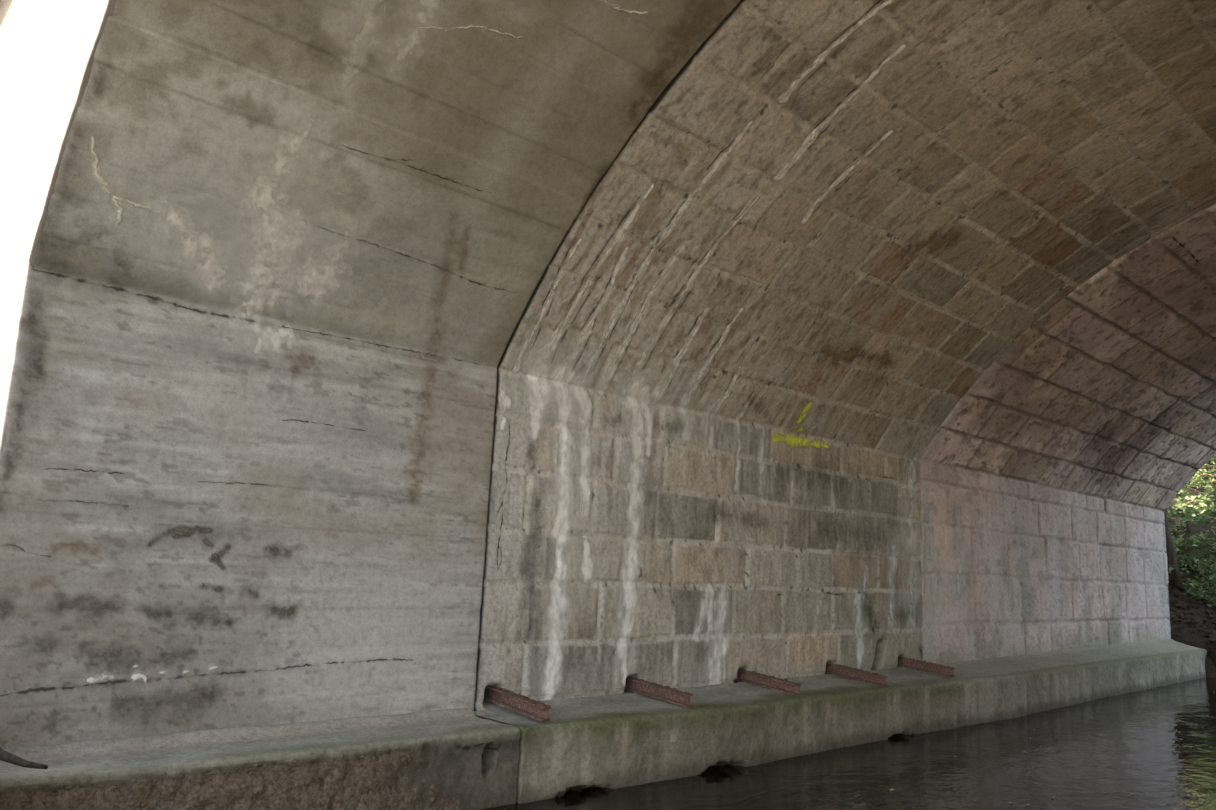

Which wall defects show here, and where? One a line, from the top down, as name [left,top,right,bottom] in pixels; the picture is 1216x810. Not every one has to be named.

crack [604,1,648,19]
water stain [780,0,893,102]
water stain [774,44,906,180]
crack [91,136,151,225]
water stain [801,130,893,223]
water stain [166,207,226,290]
water stain [238,124,352,353]
water stain [512,120,759,701]